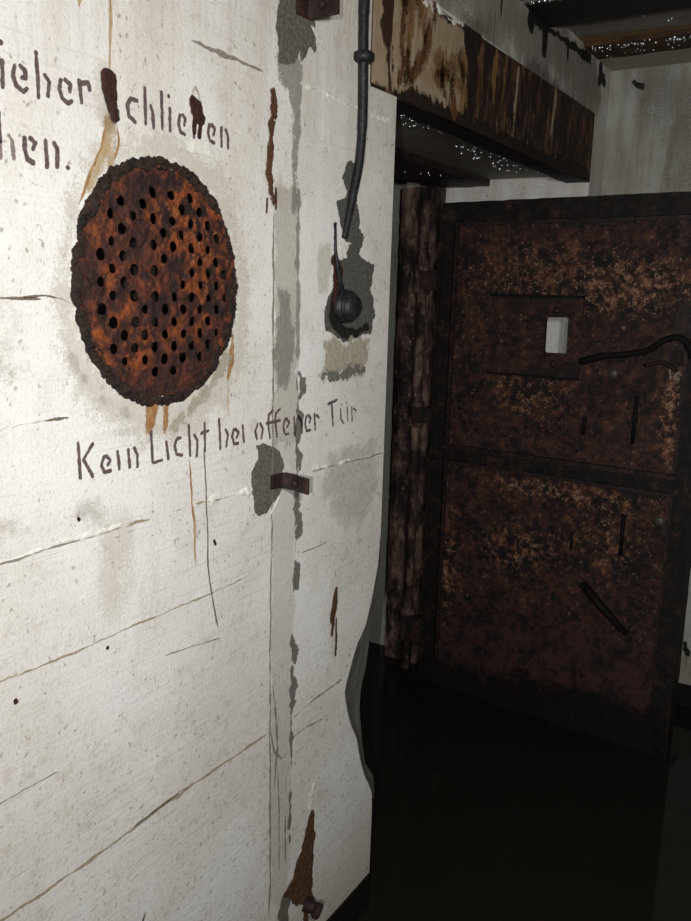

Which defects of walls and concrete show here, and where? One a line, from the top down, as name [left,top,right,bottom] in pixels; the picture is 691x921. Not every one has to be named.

rust [79,0,120,203]
rust [265,88,278,213]
water stain [440,0,600,138]
rust [145,404,169,434]
crack [0,215,385,921]
rust [330,587,338,656]
rust [277,782,316,921]